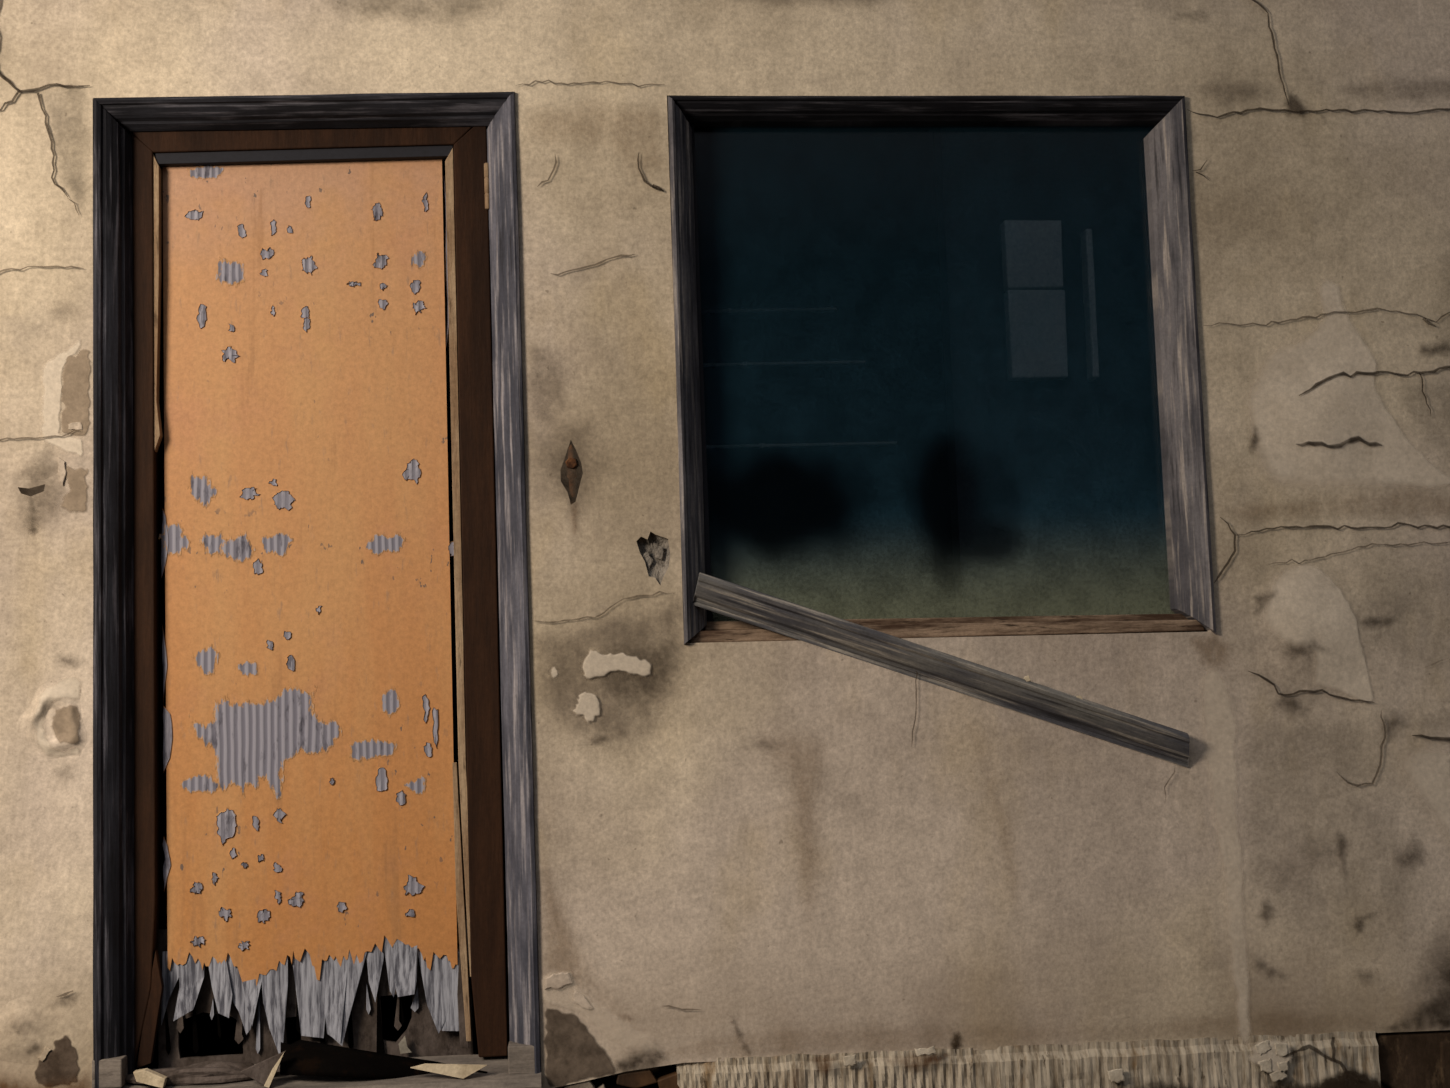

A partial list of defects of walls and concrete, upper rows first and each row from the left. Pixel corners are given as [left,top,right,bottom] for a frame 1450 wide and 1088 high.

crack [1187,0,1450,118]
crack [0,72,90,215]
spalling [61,350,90,435]
crack [1299,366,1450,416]
crack [1296,436,1382,448]
spalling [57,458,88,512]
spalling [636,532,670,585]
crack [1214,517,1450,583]
spalling [52,705,80,744]
crack [1249,671,1450,787]
spalling [35,1036,79,1087]
spalling [544,1009,660,1087]